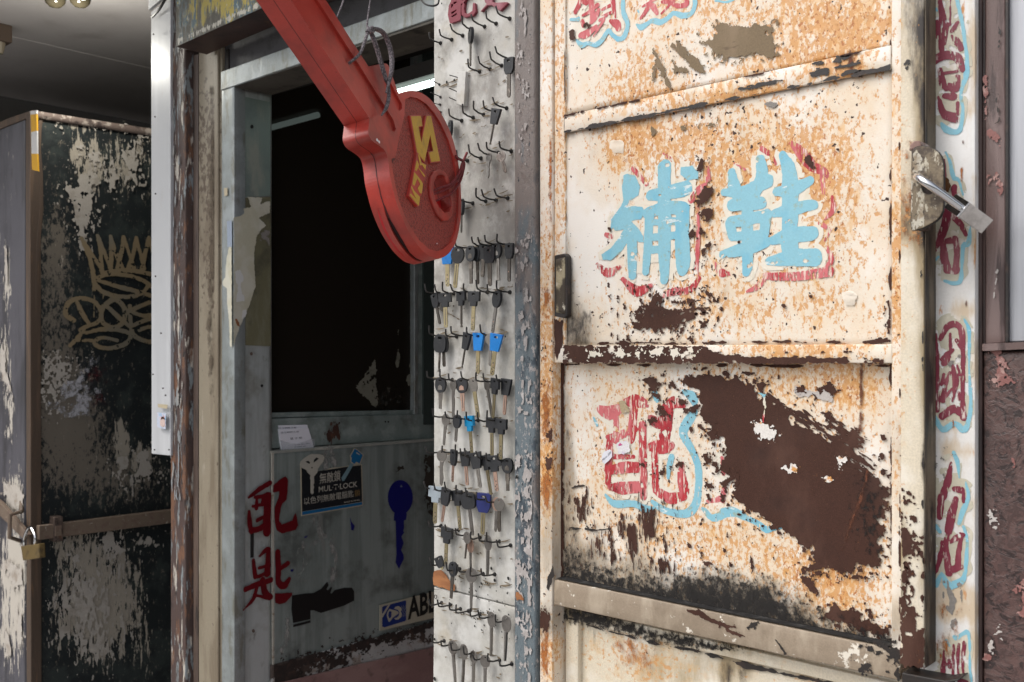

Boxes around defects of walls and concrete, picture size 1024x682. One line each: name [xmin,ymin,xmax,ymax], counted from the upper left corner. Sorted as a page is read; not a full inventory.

peeling [54,123,149,256]
peeling [107,277,183,500]
rust [541,387,553,442]
rust [858,363,901,432]
peeling [1,477,24,516]
peeling [45,529,166,680]
peeling [515,450,532,682]
rust [540,608,550,674]
rust [541,457,553,510]
peeling [554,284,925,682]
rust [890,484,901,566]
peeling [982,624,1003,661]